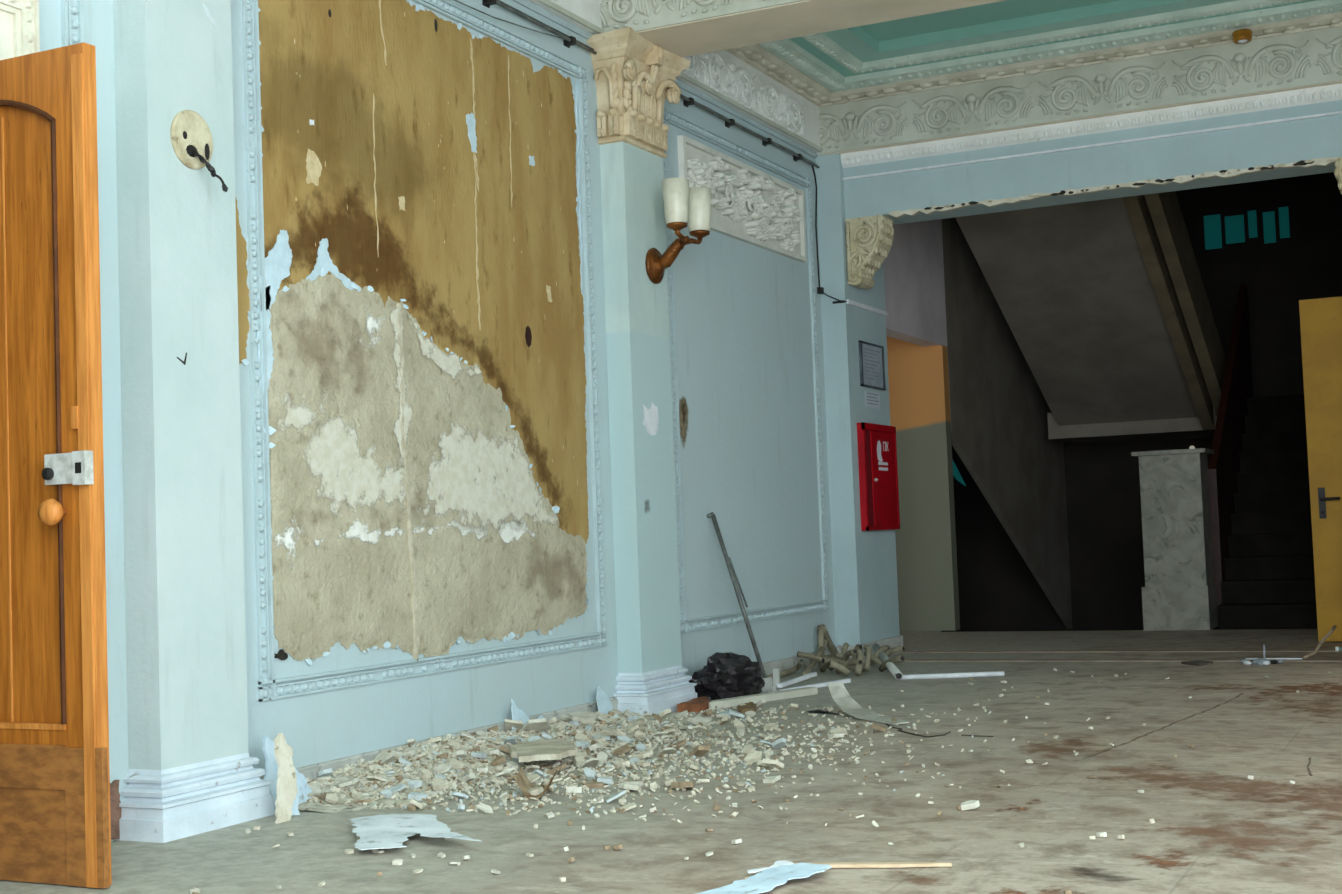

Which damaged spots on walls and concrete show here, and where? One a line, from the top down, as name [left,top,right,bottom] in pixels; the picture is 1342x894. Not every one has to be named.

water stain [288,190,507,400]
peeling [235,0,589,665]
spalling [643,402,659,436]
water stain [523,423,557,499]
crack [1295,757,1313,776]